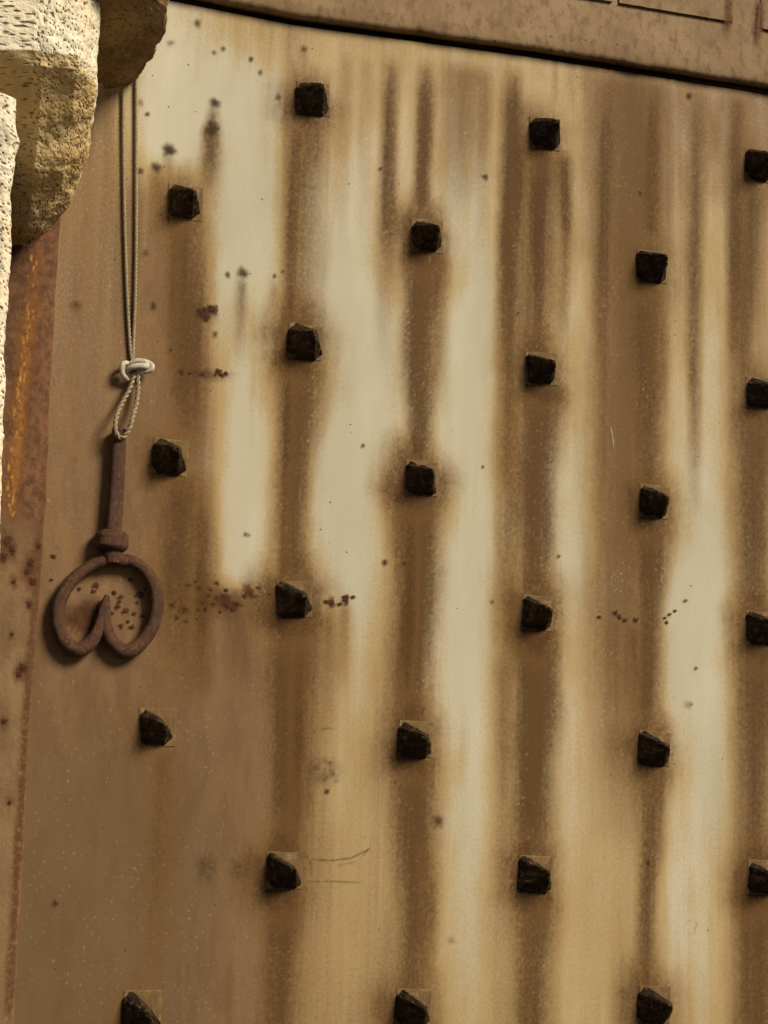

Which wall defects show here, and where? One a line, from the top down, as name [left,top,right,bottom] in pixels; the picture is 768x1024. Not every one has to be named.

rust [0,536,16,562]
rust [6,284,36,516]
rust [7,543,56,1012]
rust [67,582,99,631]
rust [111,578,146,629]
rust [169,78,356,1024]
rust [375,73,449,1024]
rust [500,80,571,1024]
rust [597,83,688,1024]
rust [689,125,701,413]